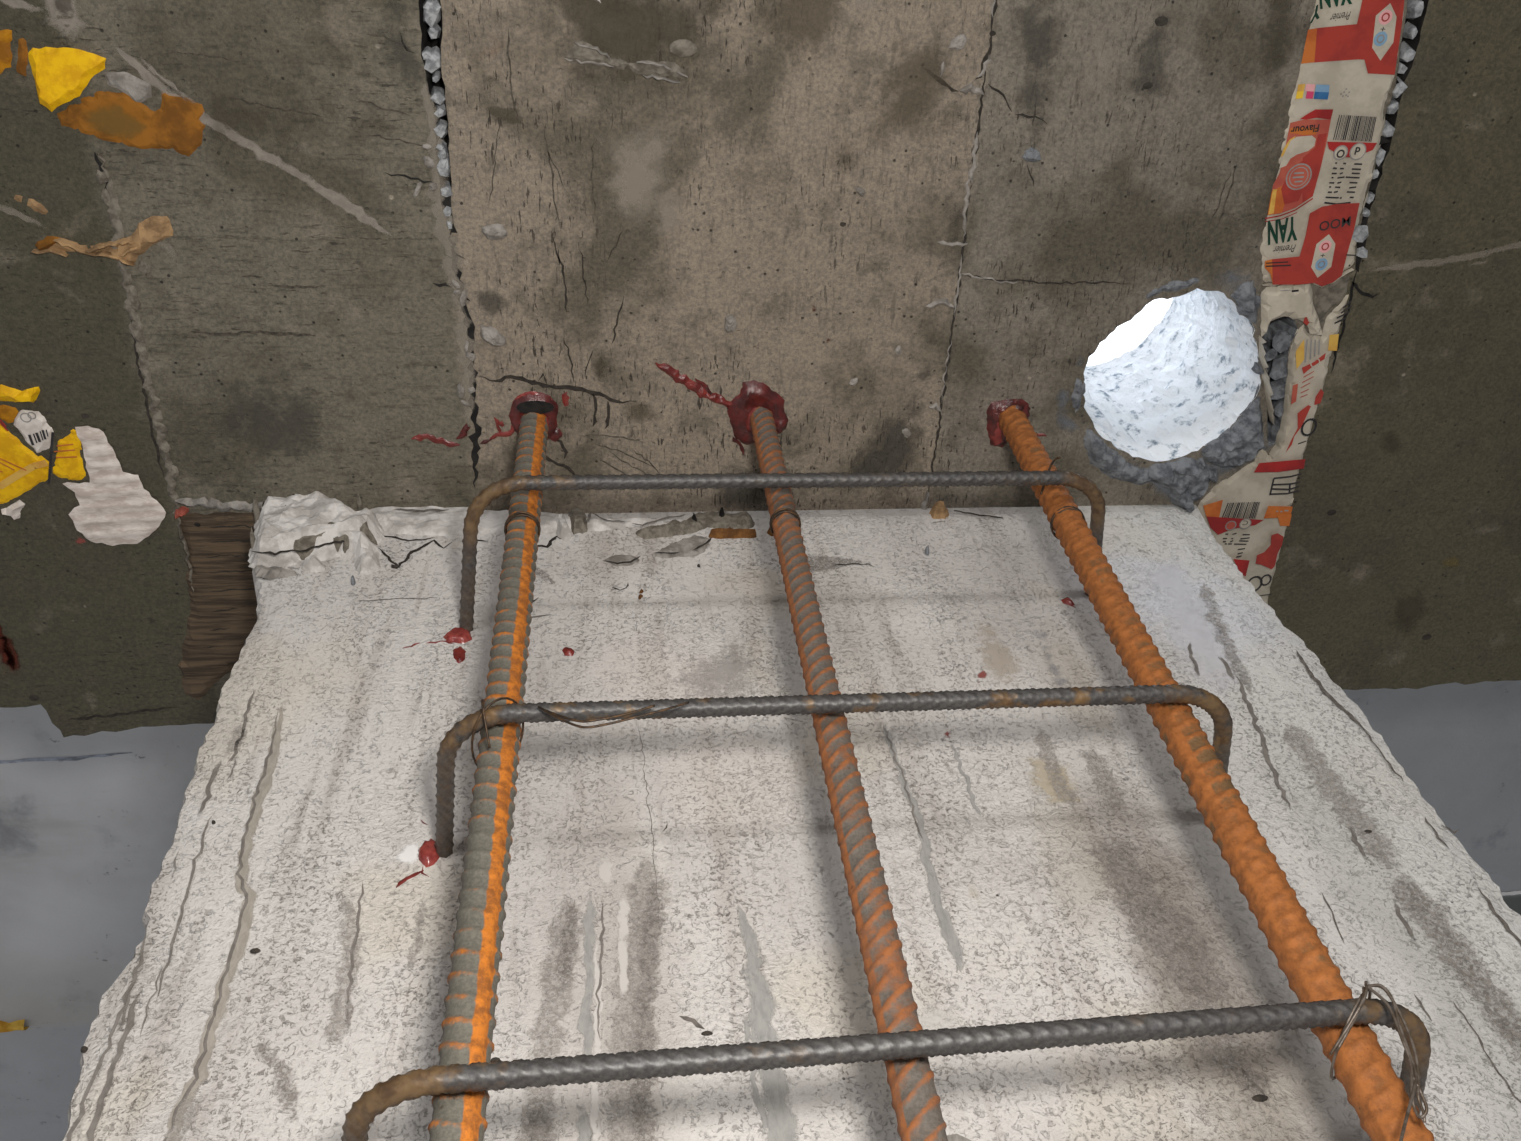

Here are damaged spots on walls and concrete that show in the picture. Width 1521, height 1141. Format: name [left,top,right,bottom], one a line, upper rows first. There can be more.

crack [160,0,659,487]
spalling [438,412,588,1066]
damp [528,857,670,1058]
damp [576,1077,656,1141]
spalling [604,406,874,695]
damp [738,906,777,1043]
damp [750,1068,798,1141]
spalling [811,713,923,1034]
crack [855,0,1120,523]
spalling [999,405,1353,1003]
spalling [1058,272,1299,513]
crack [1331,0,1429,372]